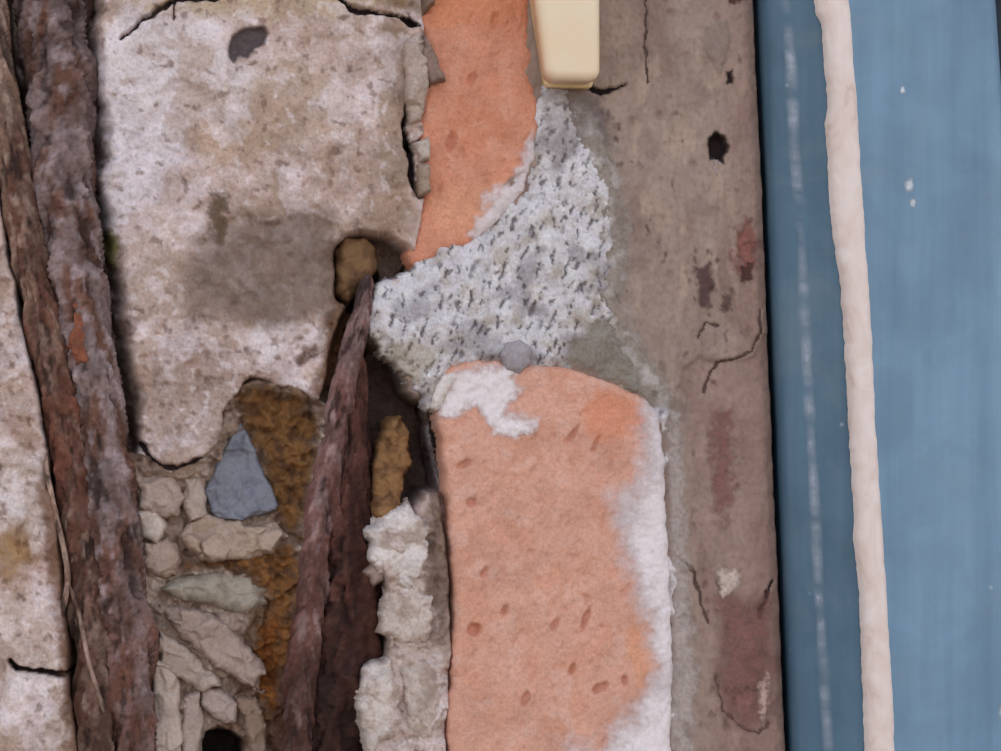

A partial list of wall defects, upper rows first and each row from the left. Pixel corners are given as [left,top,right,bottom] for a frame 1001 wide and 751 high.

crack [120,0,219,40]
crack [338,0,421,28]
spalling [403,32,446,125]
spalling [409,137,431,199]
spalling [0,0,383,751]
corrosion [235,240,351,536]
efflorescence [439,365,538,438]
crack [9,658,67,676]
corrosion [41,455,78,751]
corrosion [184,545,300,718]
water stain [426,493,451,634]
water stain [605,403,698,751]